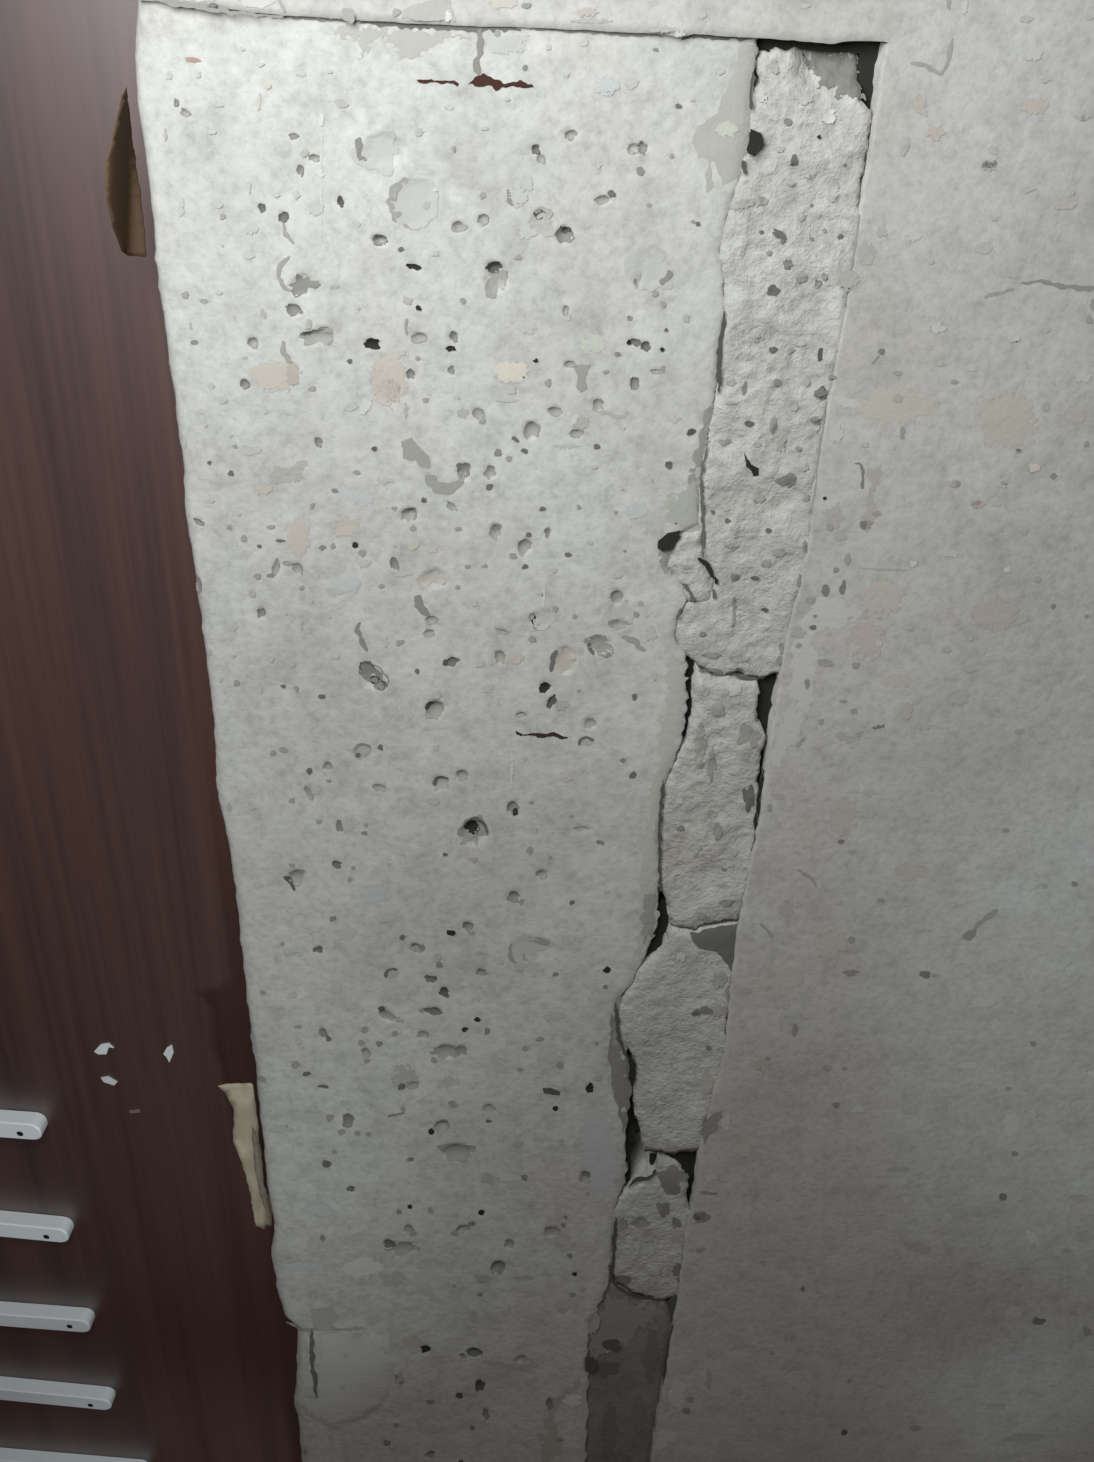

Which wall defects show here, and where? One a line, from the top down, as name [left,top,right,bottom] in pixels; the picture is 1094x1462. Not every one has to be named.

rust [417,73,534,91]
spalling [692,44,756,192]
spalling [767,284,780,296]
spalling [759,228,793,269]
crack [716,312,738,405]
crack [676,444,736,627]
spalling [539,590,639,709]
crack [657,780,665,893]
crack [751,769,764,851]
spalling [690,924,738,1016]
spalling [594,966,632,1133]
crack [609,1169,673,1386]